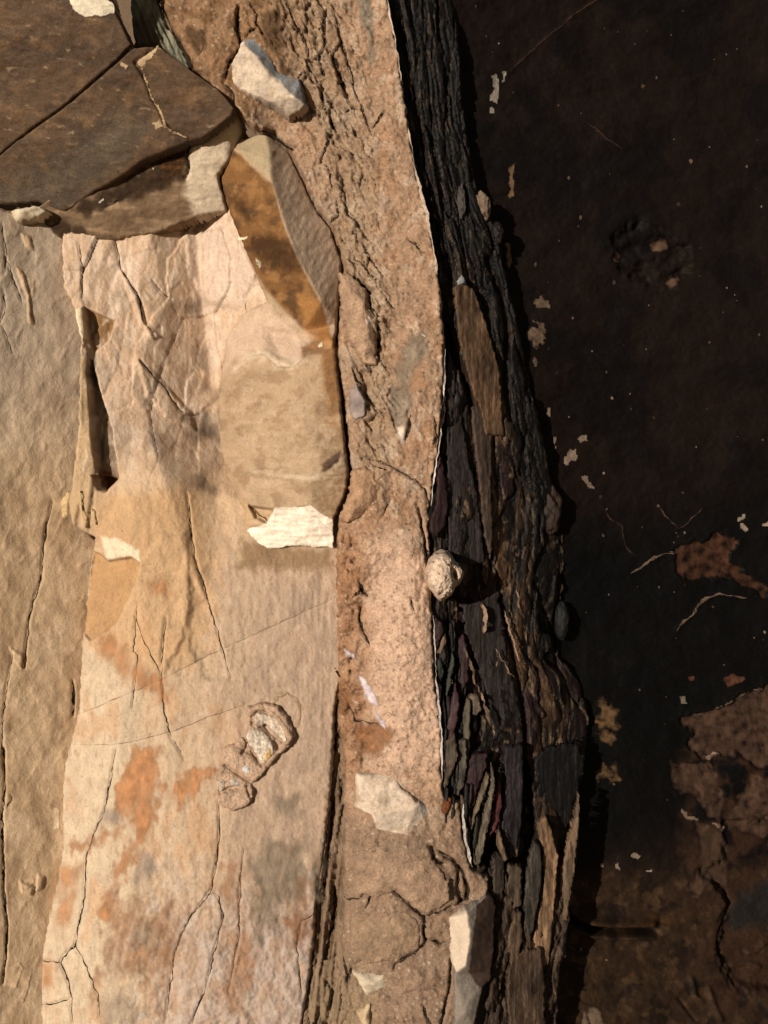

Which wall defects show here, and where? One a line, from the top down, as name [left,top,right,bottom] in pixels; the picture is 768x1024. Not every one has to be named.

peeling [673,514,767,598]
crack [43,494,325,1023]
peeling [671,664,768,896]
crack [296,798,470,1024]